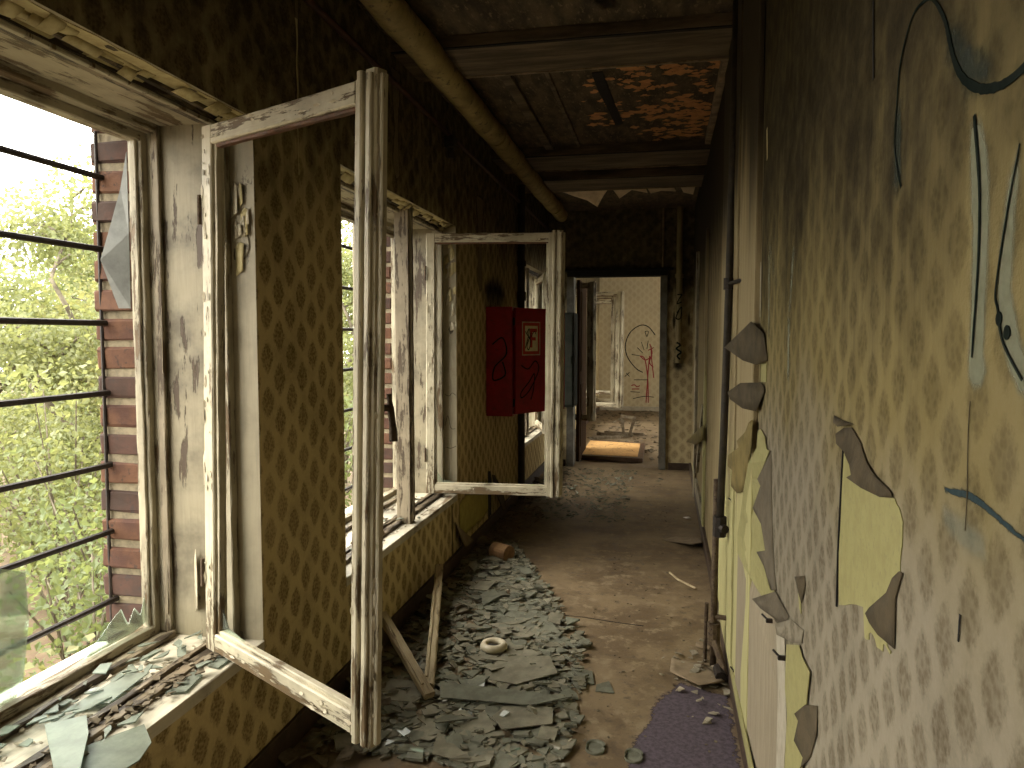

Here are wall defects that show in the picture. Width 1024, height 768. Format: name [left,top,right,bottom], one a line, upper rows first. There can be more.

peeling [0,0,268,199]
peeling [581,61,720,141]
peeling [299,691,352,742]
peeling [735,555,787,768]